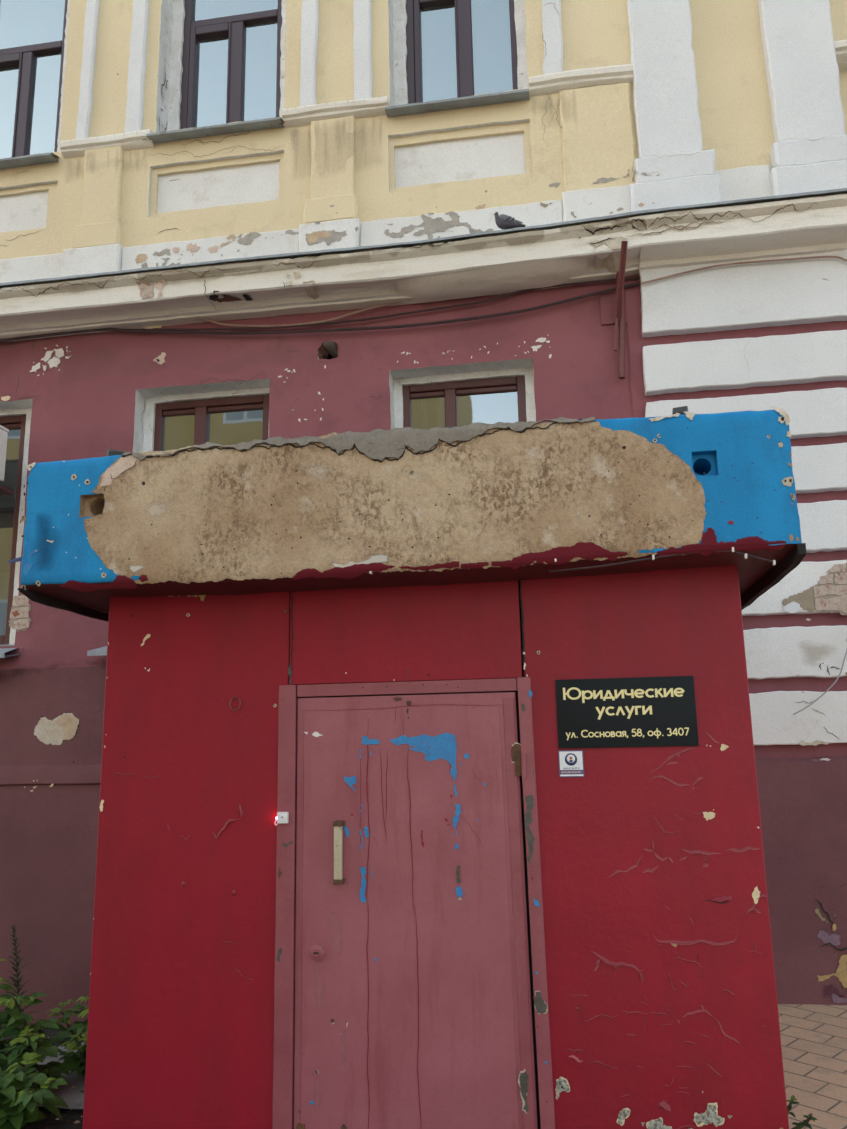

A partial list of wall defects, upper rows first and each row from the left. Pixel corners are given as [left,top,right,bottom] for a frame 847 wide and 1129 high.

peeling [384,207,493,248]
crack [579,203,814,244]
peeling [135,221,359,300]
flaking render [30,345,71,376]
peeling [71,411,722,601]
flaking render [782,562,847,621]
flaking render [33,712,80,746]
peeling [360,733,469,850]
crack [607,731,761,878]
crack [814,899,847,951]
crack [566,894,767,1106]
flaking render [689,1091,732,1129]